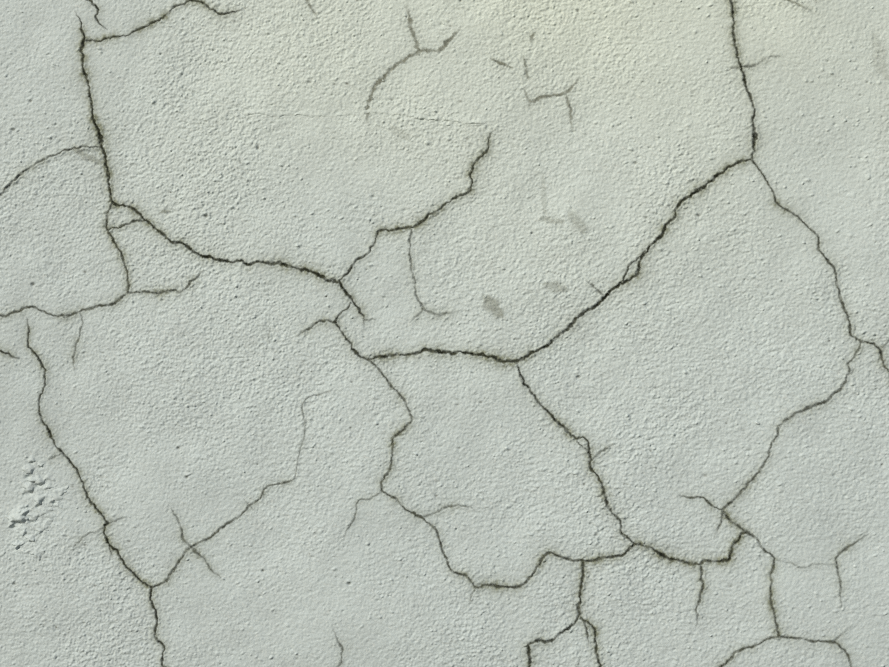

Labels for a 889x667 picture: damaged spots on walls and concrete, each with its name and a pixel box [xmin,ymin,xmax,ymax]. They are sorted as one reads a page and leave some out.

crack [0,0,840,400]
crack [0,328,292,666]
crack [380,407,412,499]
crack [435,367,644,667]
crack [688,471,775,608]
crack [785,357,854,420]
crack [840,300,889,372]
crack [721,585,799,667]